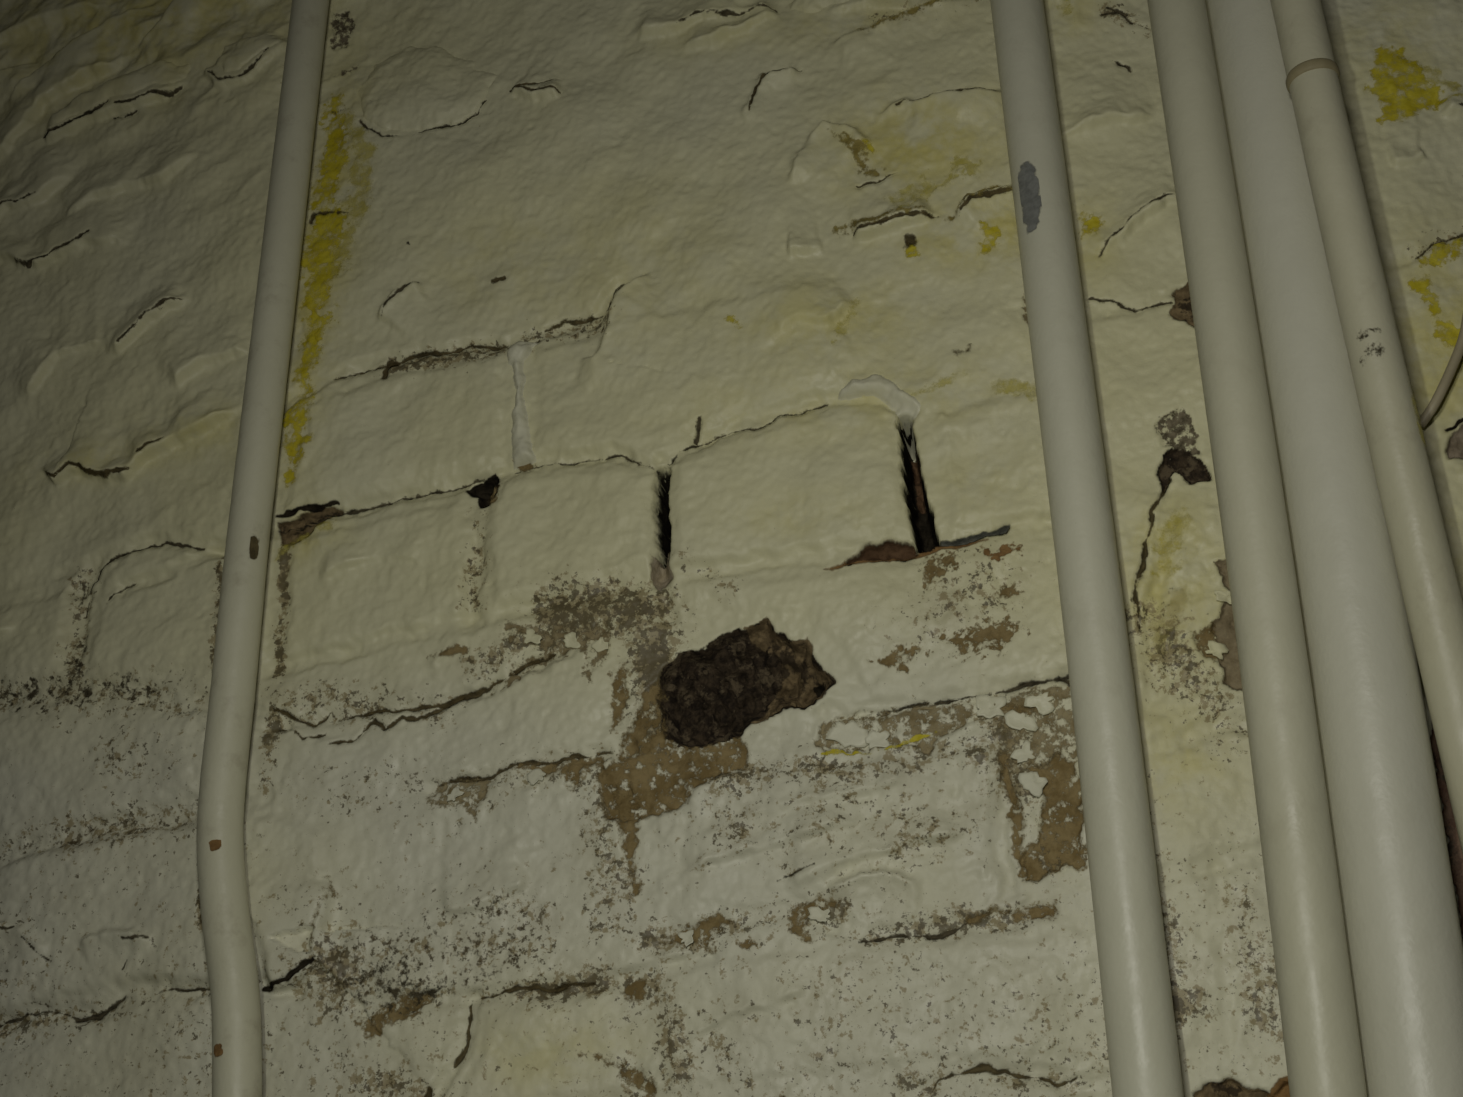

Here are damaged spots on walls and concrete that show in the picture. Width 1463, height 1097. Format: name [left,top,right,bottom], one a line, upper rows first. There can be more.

leakage [330,11,355,50]
leakage [1365,47,1460,122]
leakage [282,94,375,486]
spalling [1132,409,1212,629]
crack [273,654,556,744]
peeling [426,644,468,659]
peeling [427,774,491,819]
spalling [491,618,836,896]
spalling [814,686,1087,882]
spalling [1194,559,1242,690]